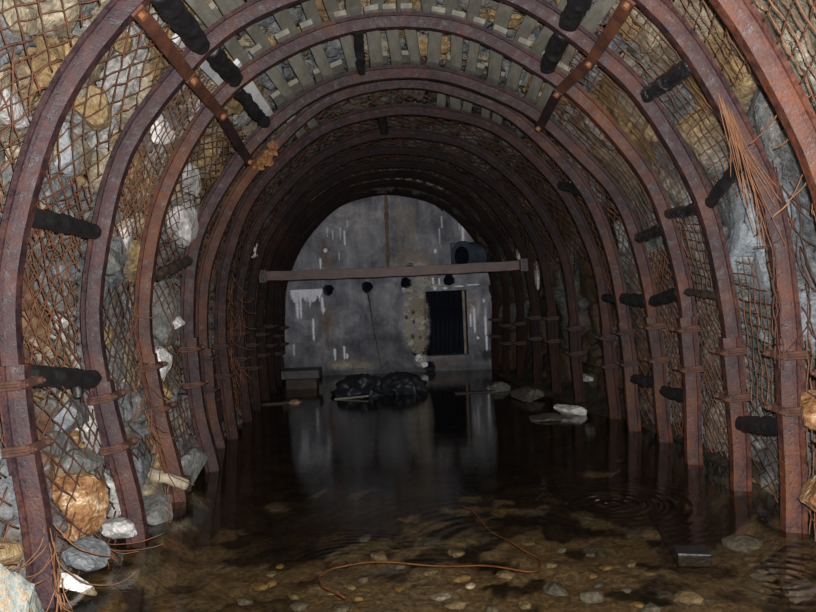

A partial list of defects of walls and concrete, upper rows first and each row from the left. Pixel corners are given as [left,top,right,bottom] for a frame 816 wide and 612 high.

efflorescence [290,289,325,319]
spalling [402,277,441,367]